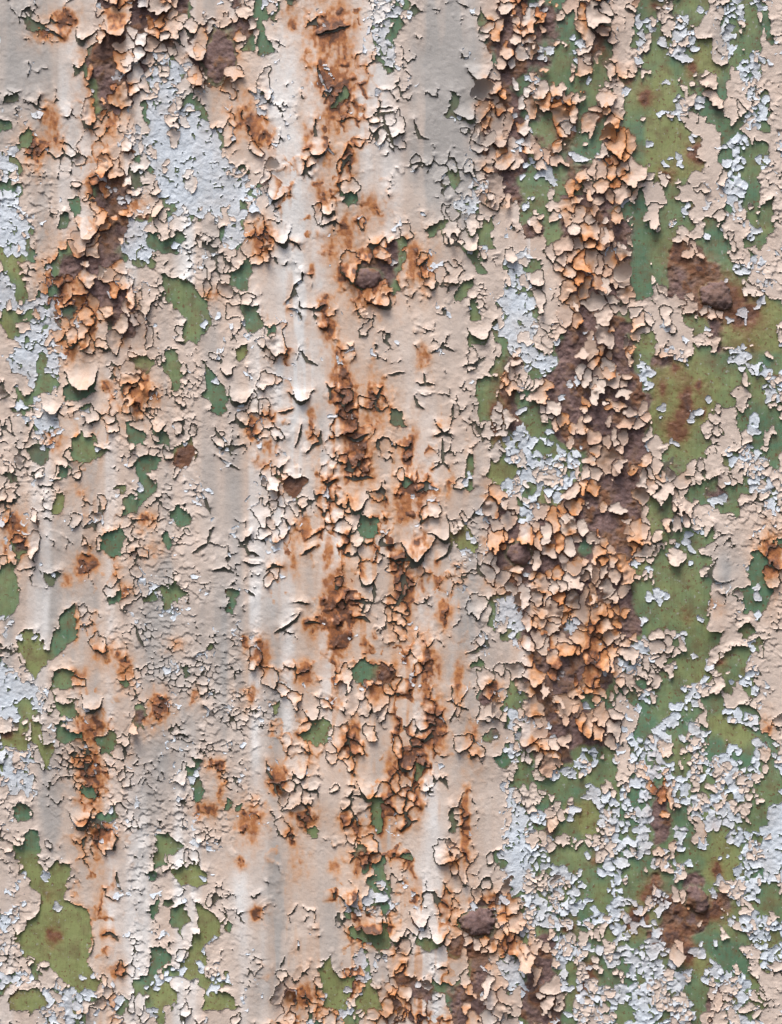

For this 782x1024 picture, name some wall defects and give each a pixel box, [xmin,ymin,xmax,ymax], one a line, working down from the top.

corrosion [274,0,361,210]
peeling [0,0,287,621]
corrosion [305,192,437,516]
peeling [417,0,760,788]
crack [134,625,144,646]
corrosion [301,534,361,683]
corrosion [377,424,466,763]
peeling [0,603,106,995]
peeling [147,832,207,888]
peeling [142,902,240,1013]
corrosion [624,873,698,969]
peeling [640,834,751,979]